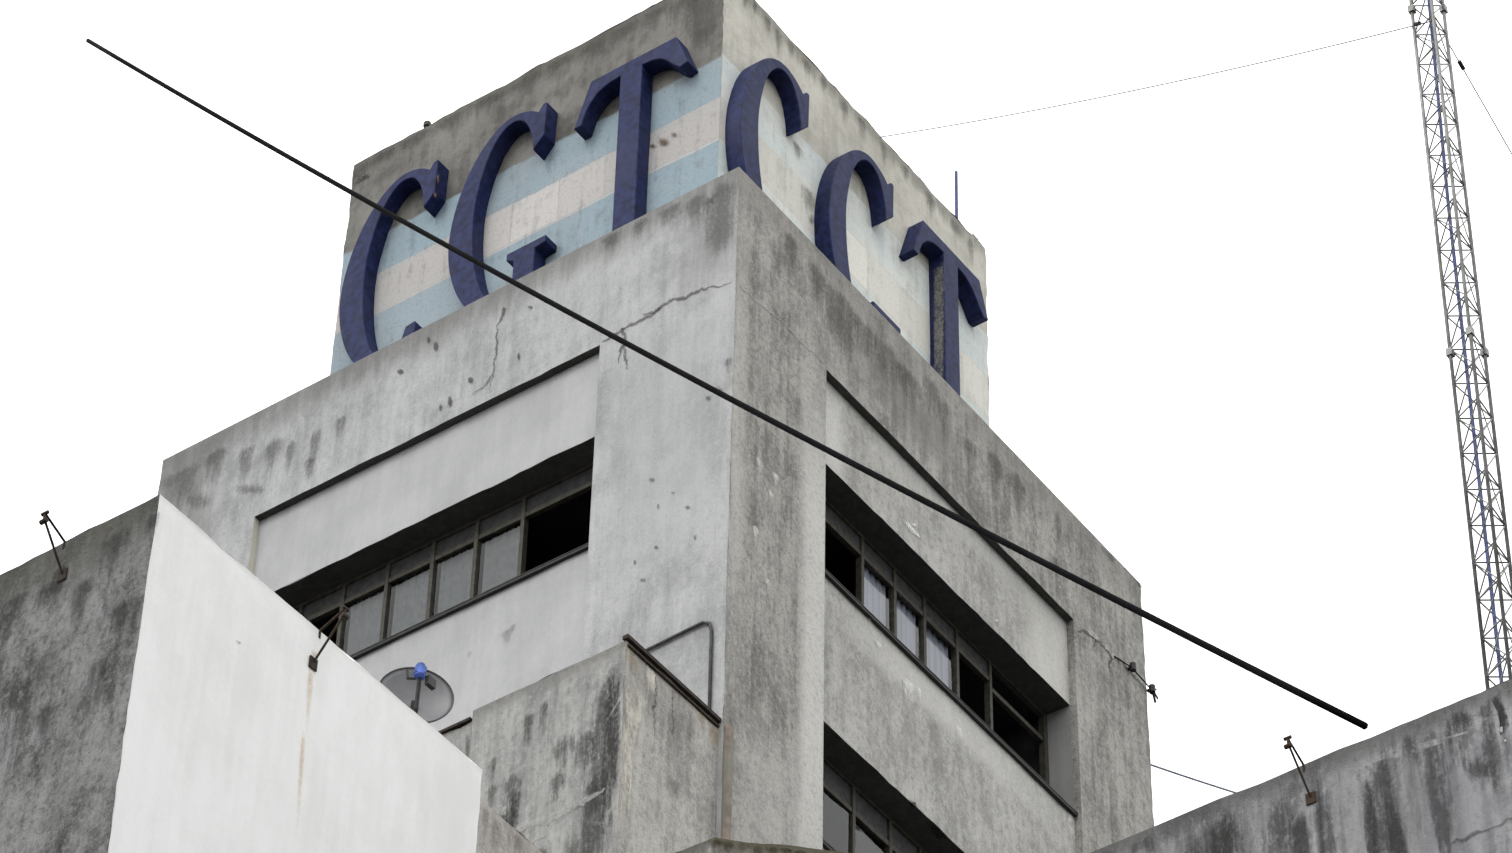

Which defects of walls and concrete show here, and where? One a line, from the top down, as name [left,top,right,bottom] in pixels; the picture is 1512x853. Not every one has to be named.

crack [604,284,726,369]
leakage [557,669,657,853]
leakage [1269,796,1334,853]
leakage [1364,707,1496,853]